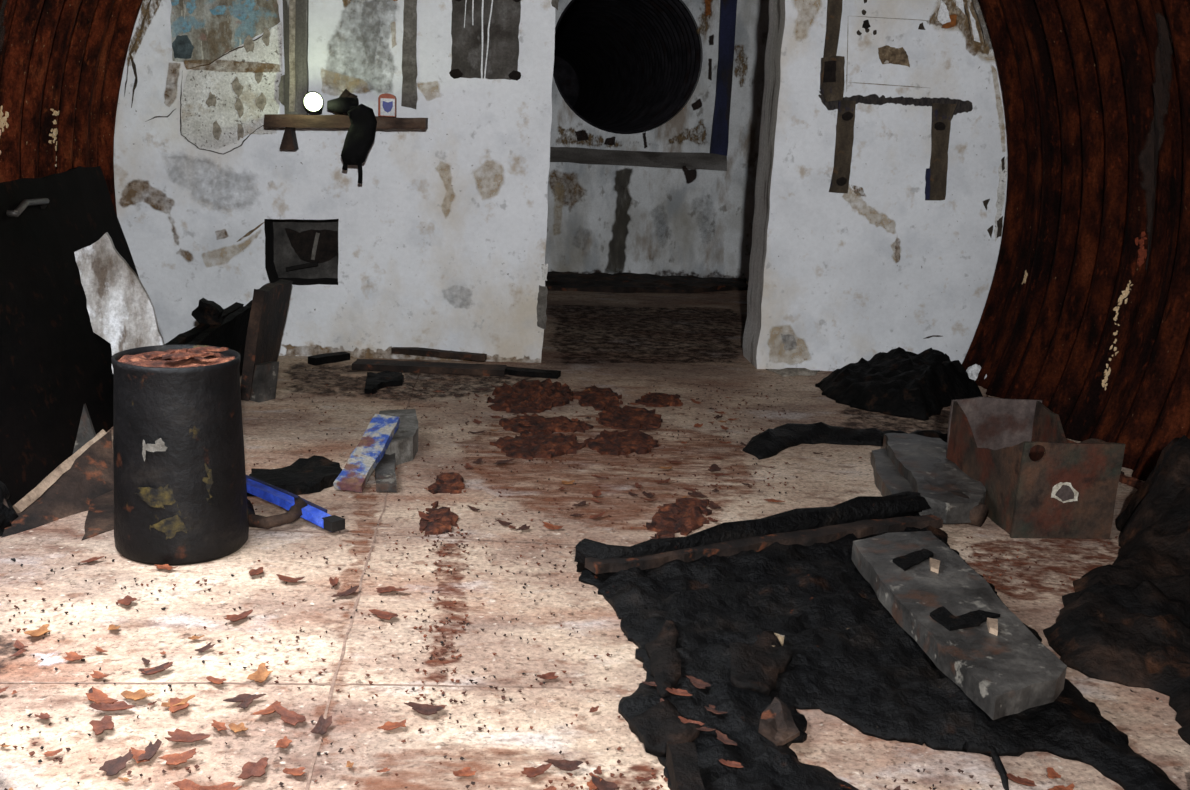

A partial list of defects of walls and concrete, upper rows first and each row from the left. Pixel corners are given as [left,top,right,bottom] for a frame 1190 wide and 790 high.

flaking render [170,0,283,154]
flaking render [857,0,910,67]
water stain [575,168,632,274]
peeling [1135,231,1147,267]
peeling [1102,280,1133,390]